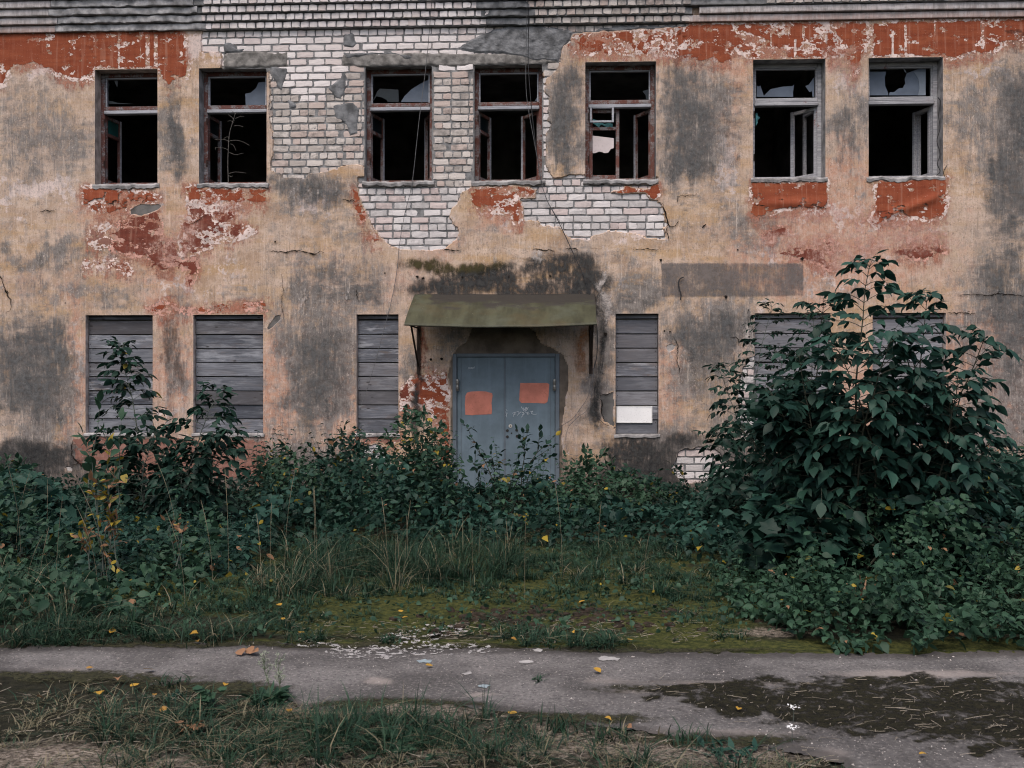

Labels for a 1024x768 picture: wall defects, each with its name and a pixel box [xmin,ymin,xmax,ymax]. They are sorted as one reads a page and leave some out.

peeling [0,31,193,89]
spalling [201,0,1024,252]
leakage [665,70,713,182]
peeling [76,183,270,290]
leakage [0,319,71,423]
leakage [0,439,74,475]
spalling [399,328,568,484]
leakage [408,250,612,435]
spalling [671,447,735,484]